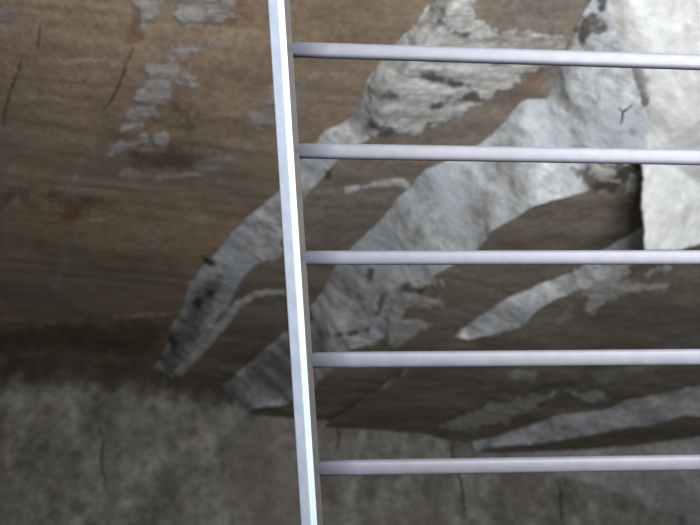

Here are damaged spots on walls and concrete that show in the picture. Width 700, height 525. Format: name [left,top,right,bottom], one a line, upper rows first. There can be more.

peeling [132,0,239,32]
peeling [403,0,568,50]
crack [3,60,23,127]
crack [104,46,134,110]
peeling [107,40,217,156]
peeling [249,85,275,126]
peeling [362,60,550,138]
crack [618,104,632,124]
peeling [589,164,642,195]
peeling [376,277,446,349]
peeling [572,265,672,316]
peeling [437,390,557,432]